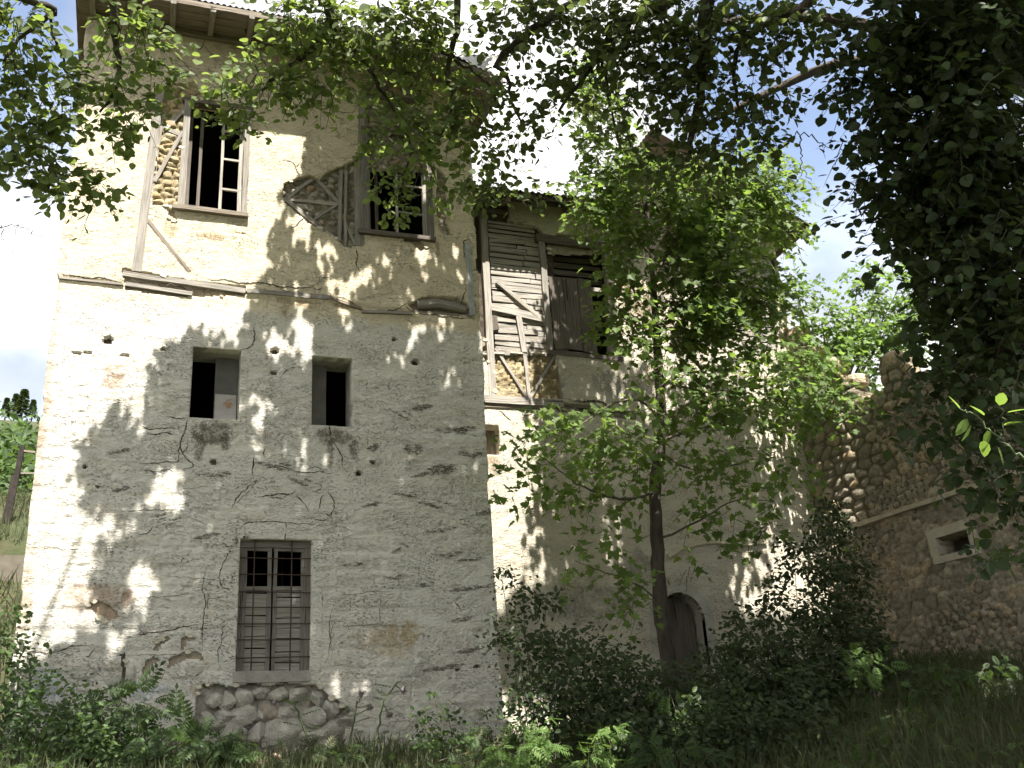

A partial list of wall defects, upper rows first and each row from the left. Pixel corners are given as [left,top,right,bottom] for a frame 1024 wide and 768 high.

spalling [152,82,204,223]
spalling [283,71,450,248]
crack [57,273,470,319]
spalling [410,203,600,411]
crack [141,416,194,472]
damp [191,421,233,459]
damp [318,428,358,464]
crack [121,425,343,665]
spalling [85,599,119,624]
spalling [119,633,208,693]